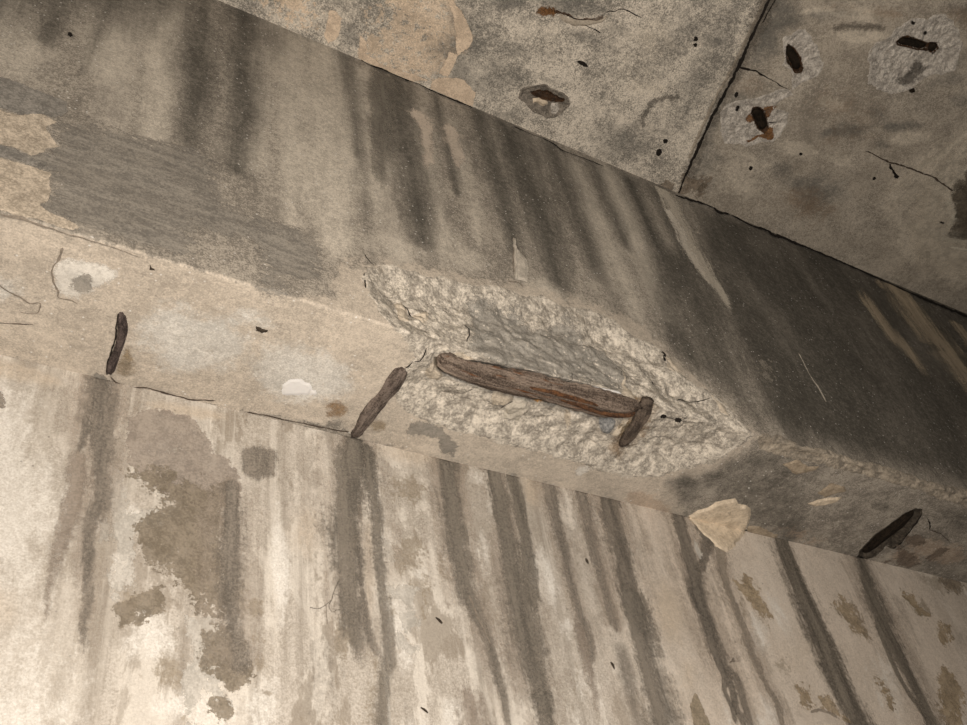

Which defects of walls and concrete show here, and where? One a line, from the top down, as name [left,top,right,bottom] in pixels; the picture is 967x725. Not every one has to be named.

crack [0,213,140,304]
leakage [0,77,327,299]
peeling [358,0,476,106]
peeling [516,249,529,282]
hole [720,29,824,147]
crack [866,151,953,191]
hole [867,14,963,94]
spalling [361,264,967,508]
leakage [48,375,277,725]
leakage [575,491,710,725]
leakage [672,513,784,725]
leakage [775,538,872,725]